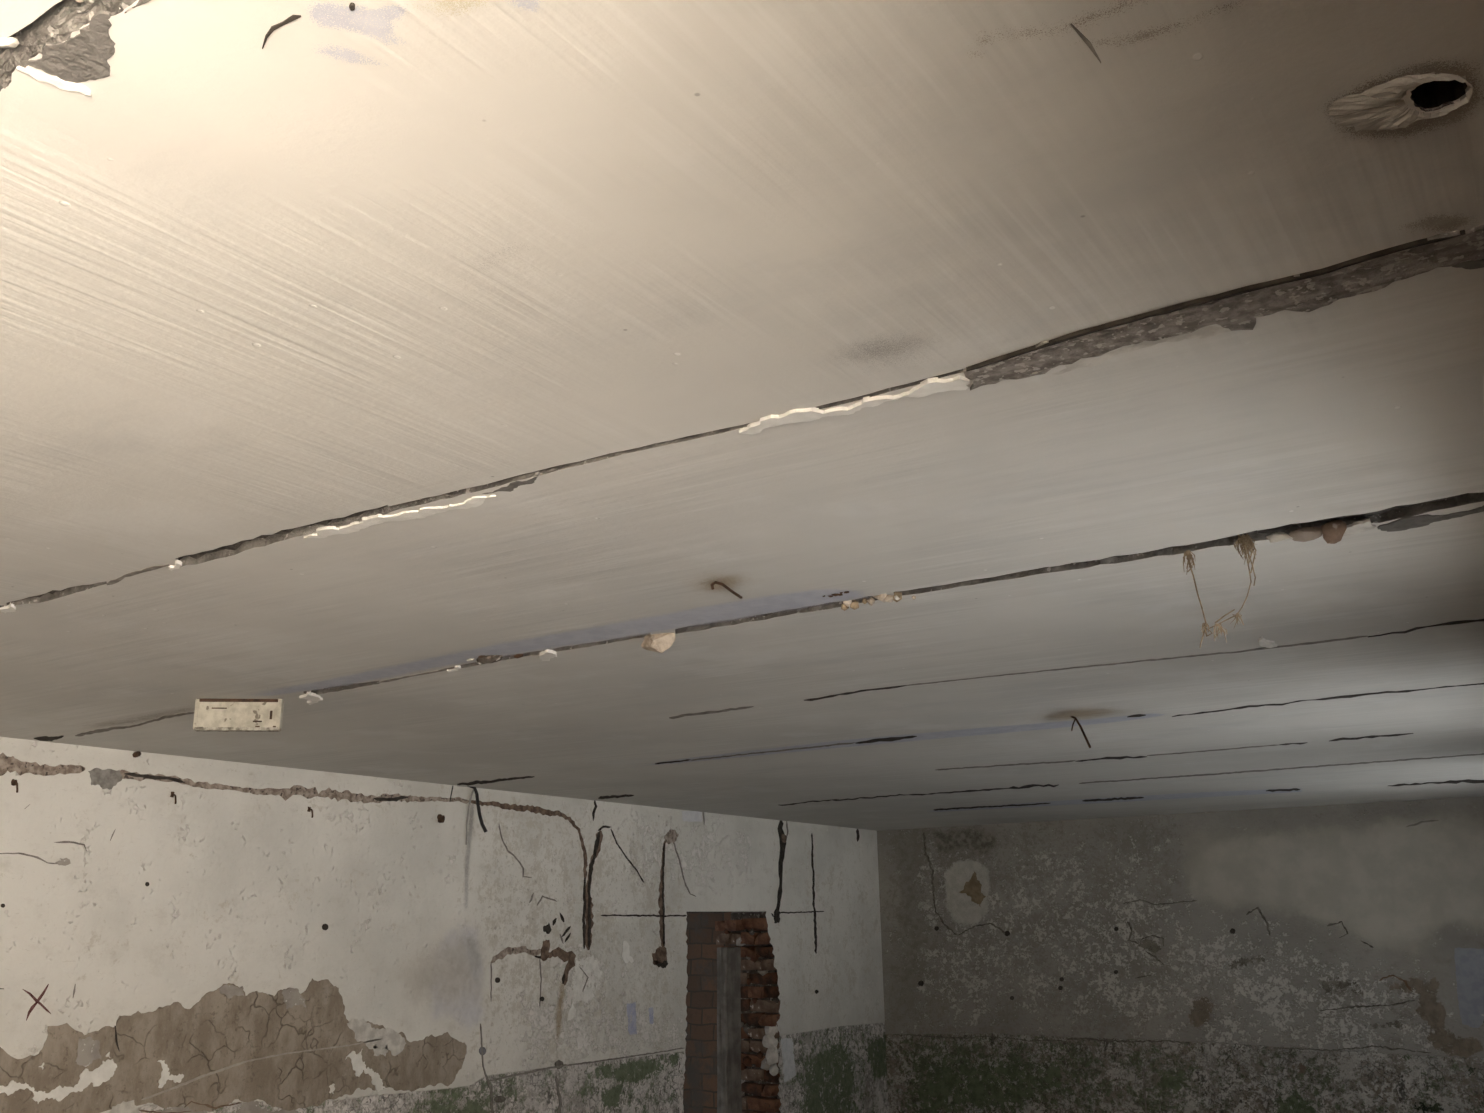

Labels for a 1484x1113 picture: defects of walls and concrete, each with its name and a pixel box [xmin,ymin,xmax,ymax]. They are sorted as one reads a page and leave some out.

spalling [0,0,151,96]
water stain [262,0,544,66]
spalling [963,225,1484,391]
crack [107,564,169,585]
spalling [0,756,22,776]
crack [34,712,194,741]
crack [804,619,1484,701]
crack [1172,683,1484,717]
crack [771,733,1484,923]
crack [601,843,696,917]
peeling [0,978,488,1113]
peeling [1320,975,1484,1075]